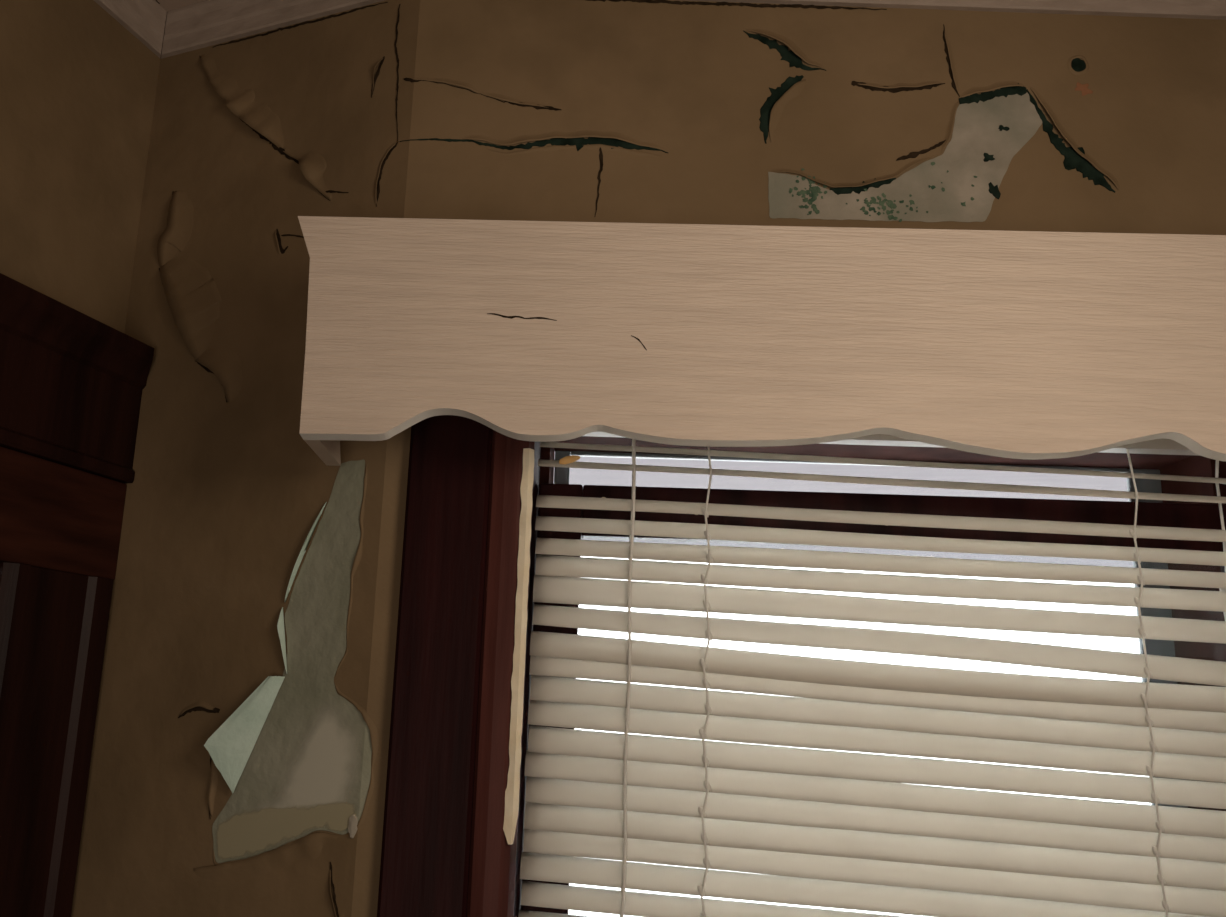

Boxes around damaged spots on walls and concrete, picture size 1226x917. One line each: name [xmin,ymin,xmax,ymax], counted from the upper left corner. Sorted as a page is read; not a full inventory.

crack [943,24,960,97]
peeling [768,81,1119,222]
peeling [193,460,378,882]